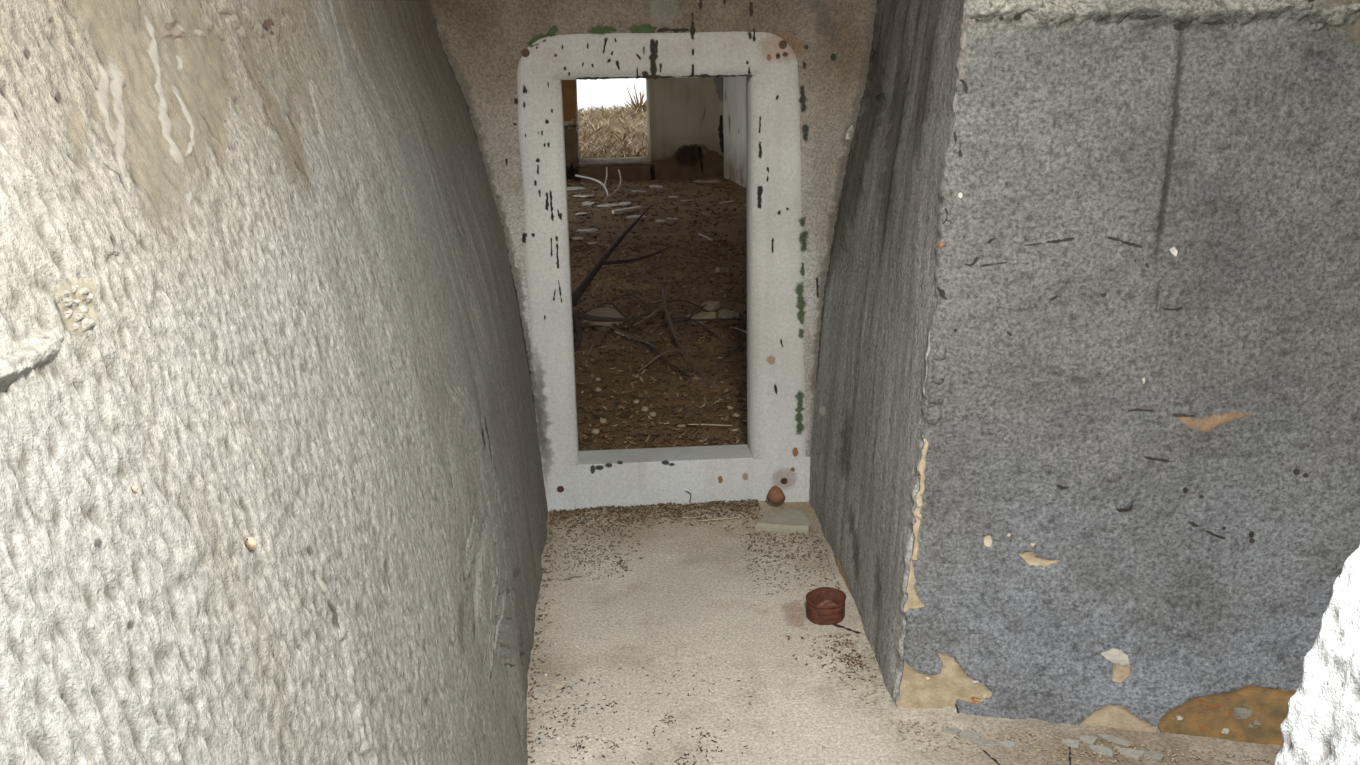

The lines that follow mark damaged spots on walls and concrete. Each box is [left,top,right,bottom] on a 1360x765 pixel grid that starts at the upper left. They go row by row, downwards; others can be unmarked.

damp [83,0,229,209]
spalling [903,347,946,612]
spalling [1019,543,1060,567]
spalling [896,652,992,740]
peeling [1101,648,1131,684]
spalling [1078,685,1296,758]